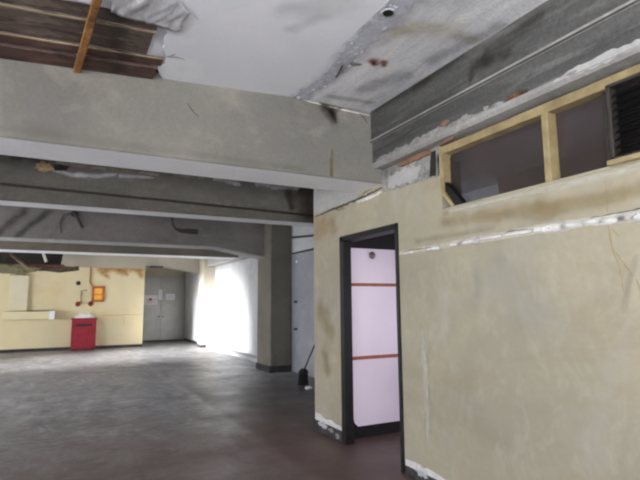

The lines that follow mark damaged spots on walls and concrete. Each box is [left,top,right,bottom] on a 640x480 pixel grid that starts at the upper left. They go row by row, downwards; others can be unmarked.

spalling [553,39,640,82]
spalling [376,101,503,162]
spalling [382,136,456,192]
peeling [399,208,640,255]
damp [99,268,144,277]
peeling [315,411,342,439]
peeling [406,459,445,480]